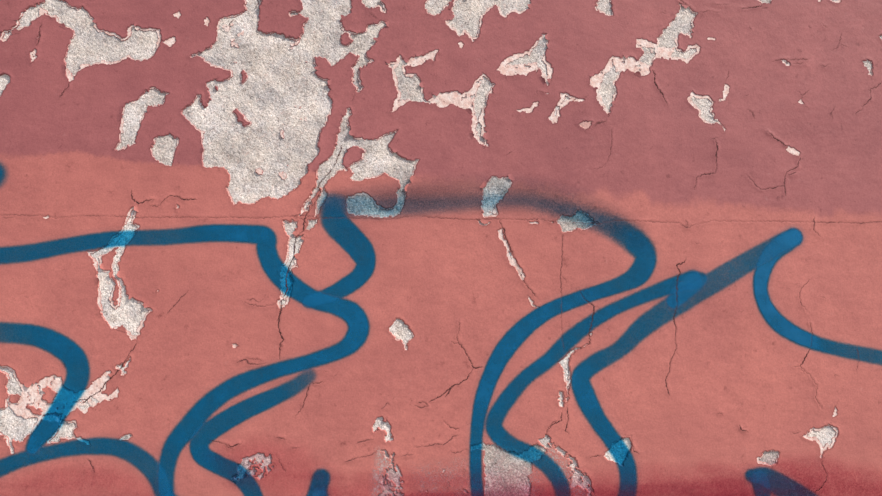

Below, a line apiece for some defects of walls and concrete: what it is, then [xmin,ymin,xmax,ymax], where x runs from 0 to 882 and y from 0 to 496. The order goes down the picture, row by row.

peeling [0,0,177,83]
peeling [113,86,171,152]
peeling [180,0,716,310]
peeling [686,83,730,132]
crack [749,133,801,193]
peeling [85,205,153,341]
crack [3,145,881,365]
peeling [0,356,132,455]
crack [82,343,137,403]
crack [415,324,481,408]
crack [665,261,685,395]
flaking render [469,435,593,496]